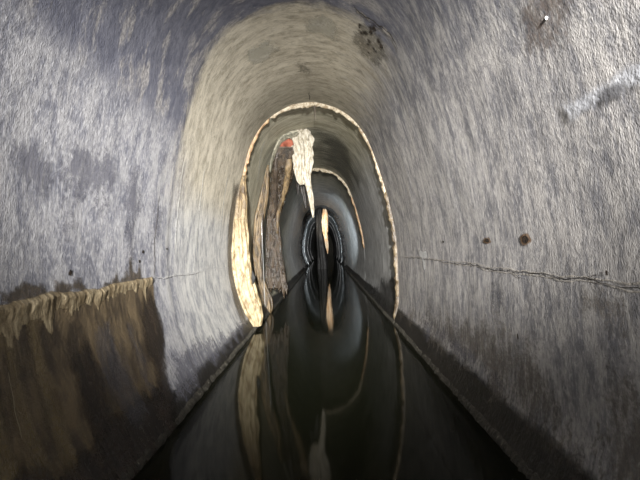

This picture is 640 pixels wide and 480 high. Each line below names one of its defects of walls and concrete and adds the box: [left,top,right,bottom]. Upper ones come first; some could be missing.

leakage [0,165,253,480]
crack [402,256,640,293]